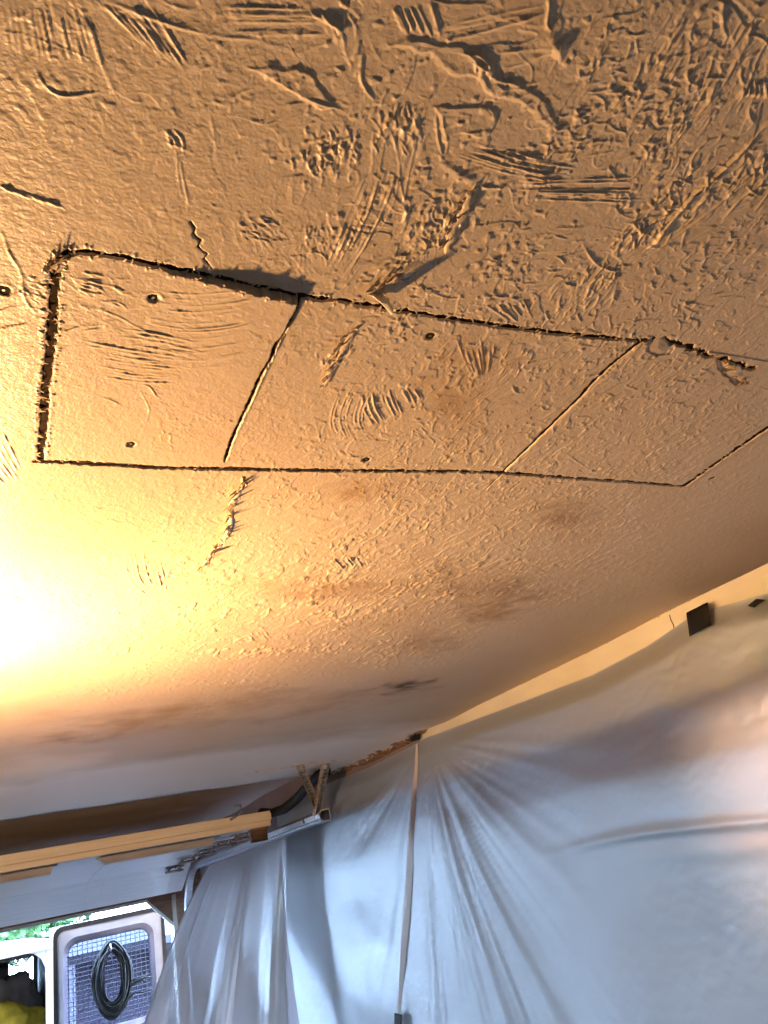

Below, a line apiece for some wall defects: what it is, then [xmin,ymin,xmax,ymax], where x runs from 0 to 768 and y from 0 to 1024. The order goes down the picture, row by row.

crack [32,221,768,490]
flaking render [331,729,427,774]